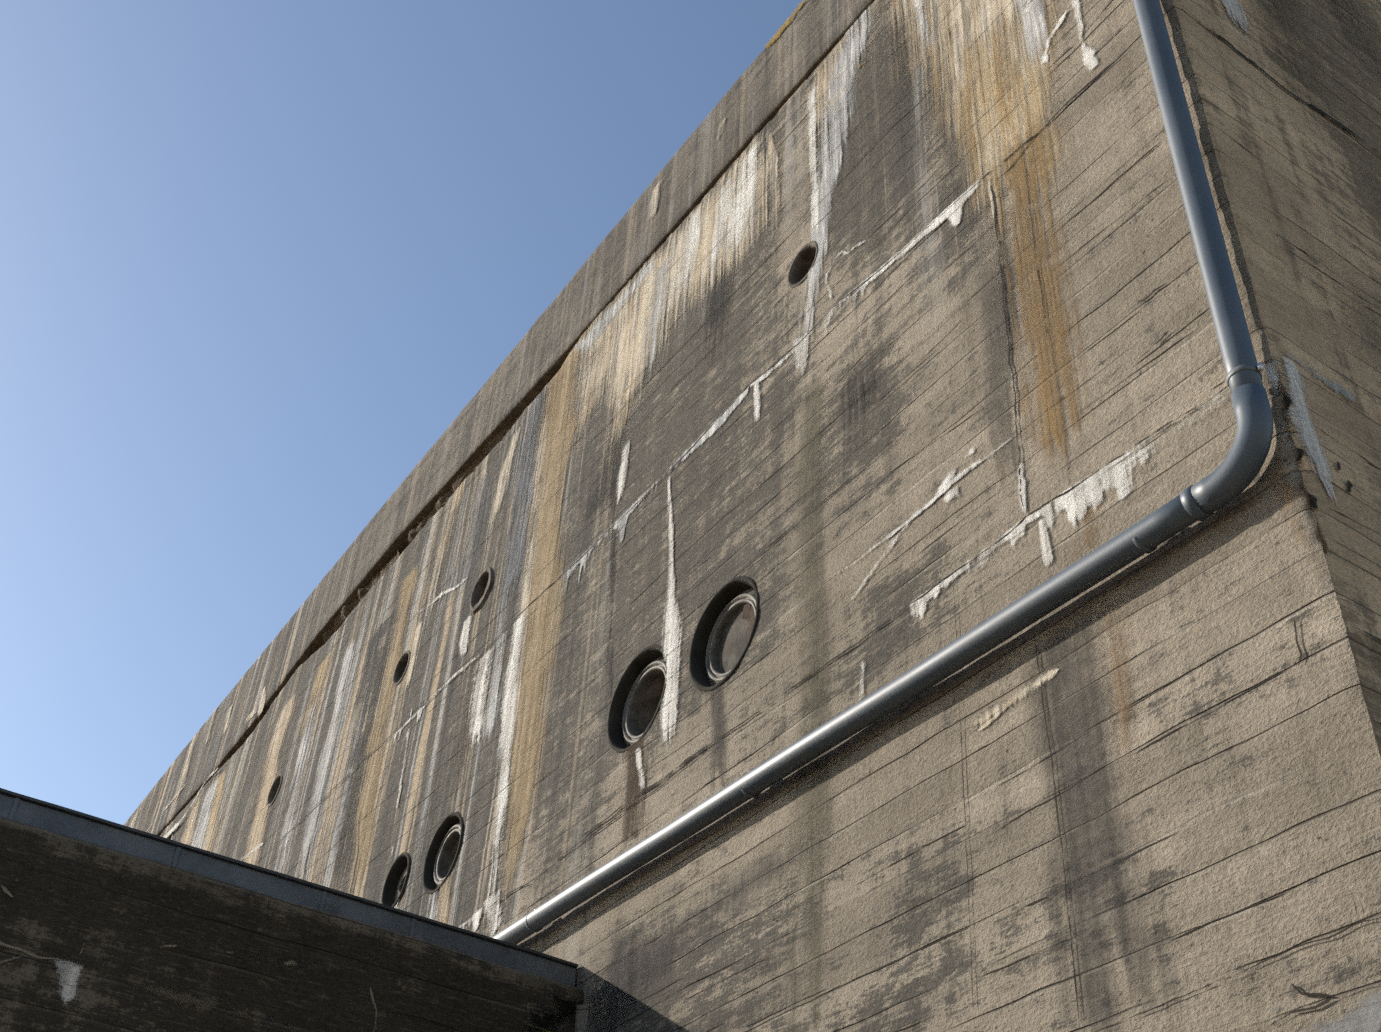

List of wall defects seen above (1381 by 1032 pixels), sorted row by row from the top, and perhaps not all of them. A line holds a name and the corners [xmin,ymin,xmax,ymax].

efflorescence [1018,0,1098,70]
crack [0,941,58,963]
damp [280,618,392,889]
damp [405,472,488,687]
damp [394,614,525,936]
corrosion [491,428,520,524]
corrosion [503,324,595,891]
crack [240,49,1228,907]
damp [564,7,985,742]
crack [958,692,975,1032]
corrosion [891,0,1078,455]
damp [910,443,1155,619]